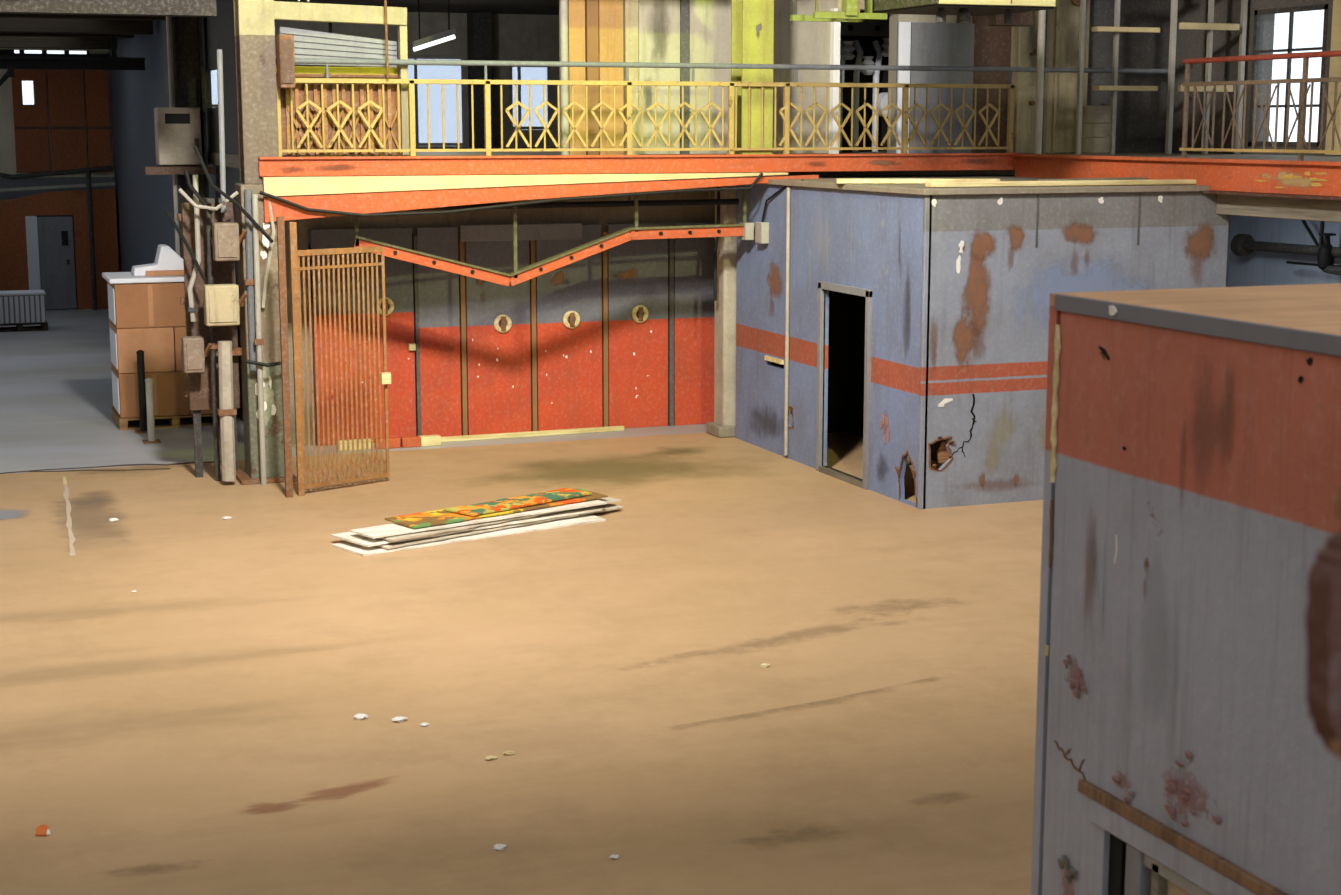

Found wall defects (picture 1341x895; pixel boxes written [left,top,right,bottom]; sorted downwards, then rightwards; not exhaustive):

rust [1064,223,1094,243]
rust [1185,226,1214,259]
rust [953,226,1024,364]
crack [949,394,977,459]